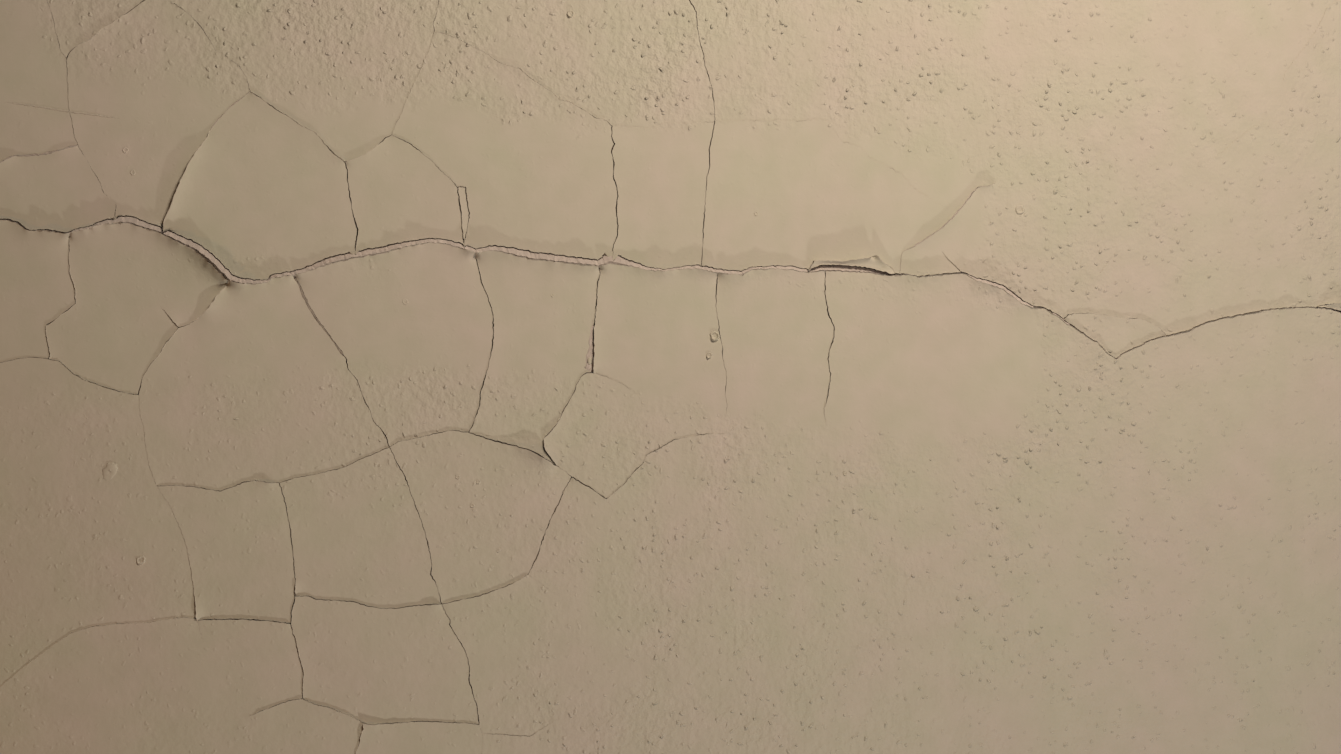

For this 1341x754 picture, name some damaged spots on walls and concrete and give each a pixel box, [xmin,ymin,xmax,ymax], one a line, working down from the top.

peeling [0,0,1044,725]
crack [0,0,1097,725]
crack [1109,305,1341,359]